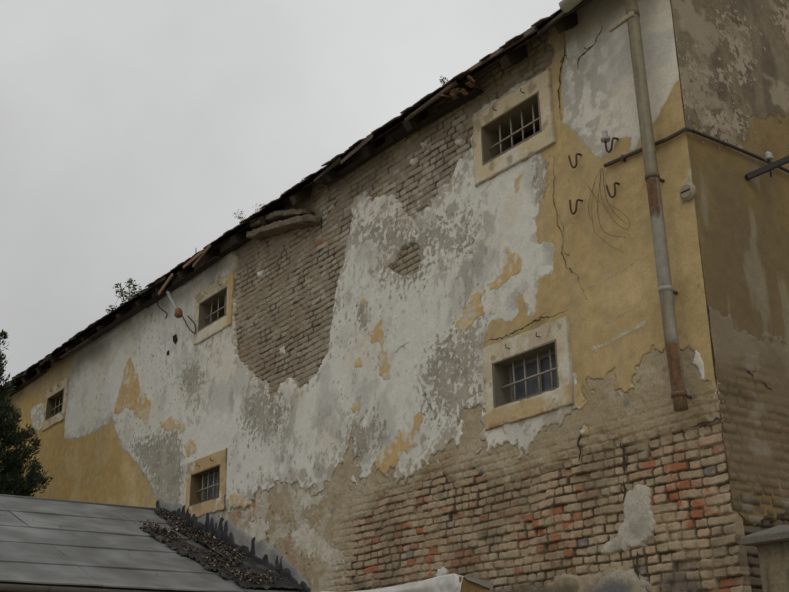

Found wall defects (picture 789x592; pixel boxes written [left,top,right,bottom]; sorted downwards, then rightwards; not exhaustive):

peeling [561,0,640,158]
flaking render [637,0,789,158]
crack [553,162,586,298]
rust [646,178,660,215]
peeling [64,31,722,592]
crack [479,310,567,346]
rust [666,342,684,401]
flaking render [708,304,789,525]